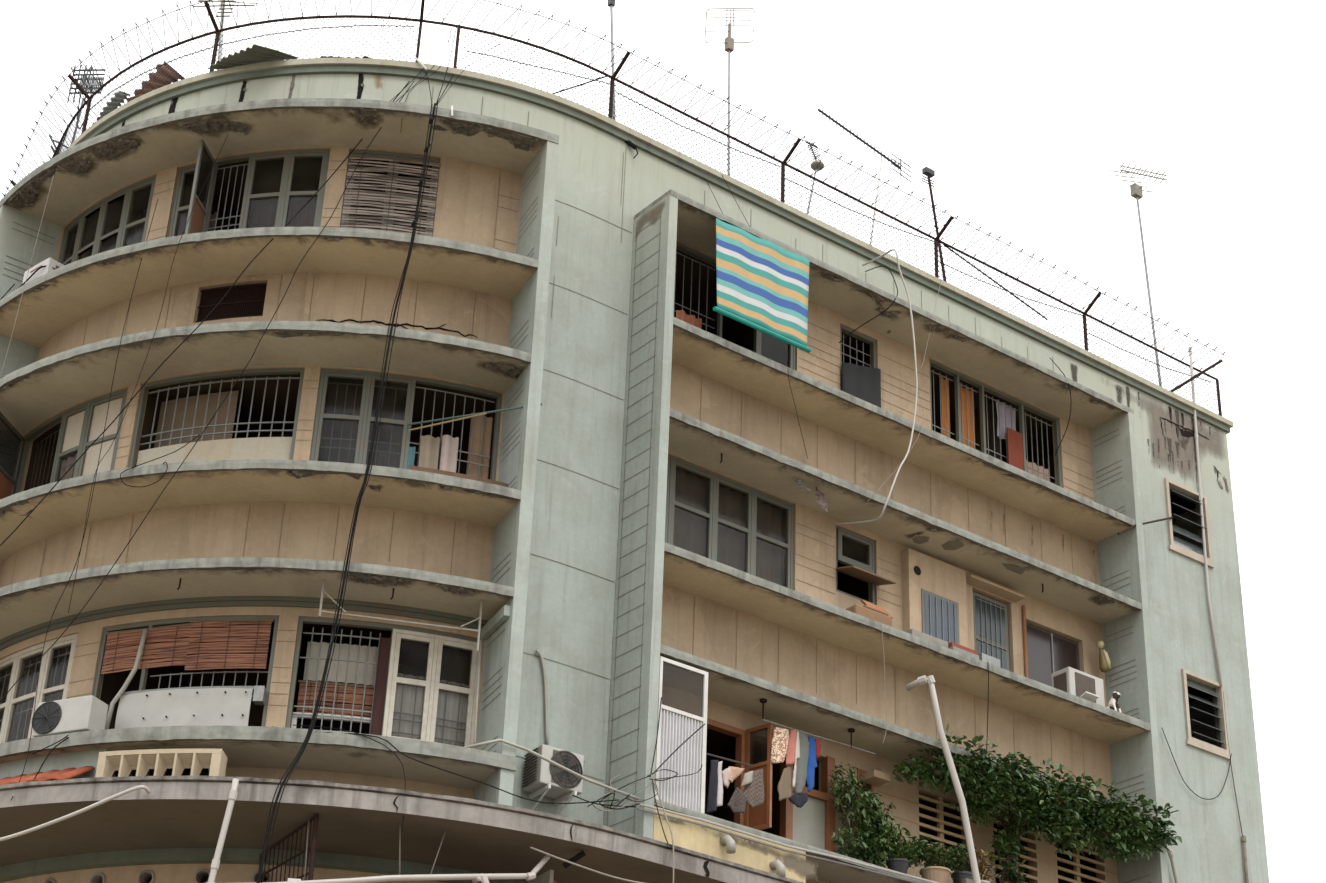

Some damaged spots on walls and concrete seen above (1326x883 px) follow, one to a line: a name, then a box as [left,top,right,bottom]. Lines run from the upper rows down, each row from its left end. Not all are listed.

spalling [180,117,249,135]
spalling [432,117,538,151]
spalling [7,139,142,209]
crack [320,319,478,338]
leakage [1116,386,1221,478]